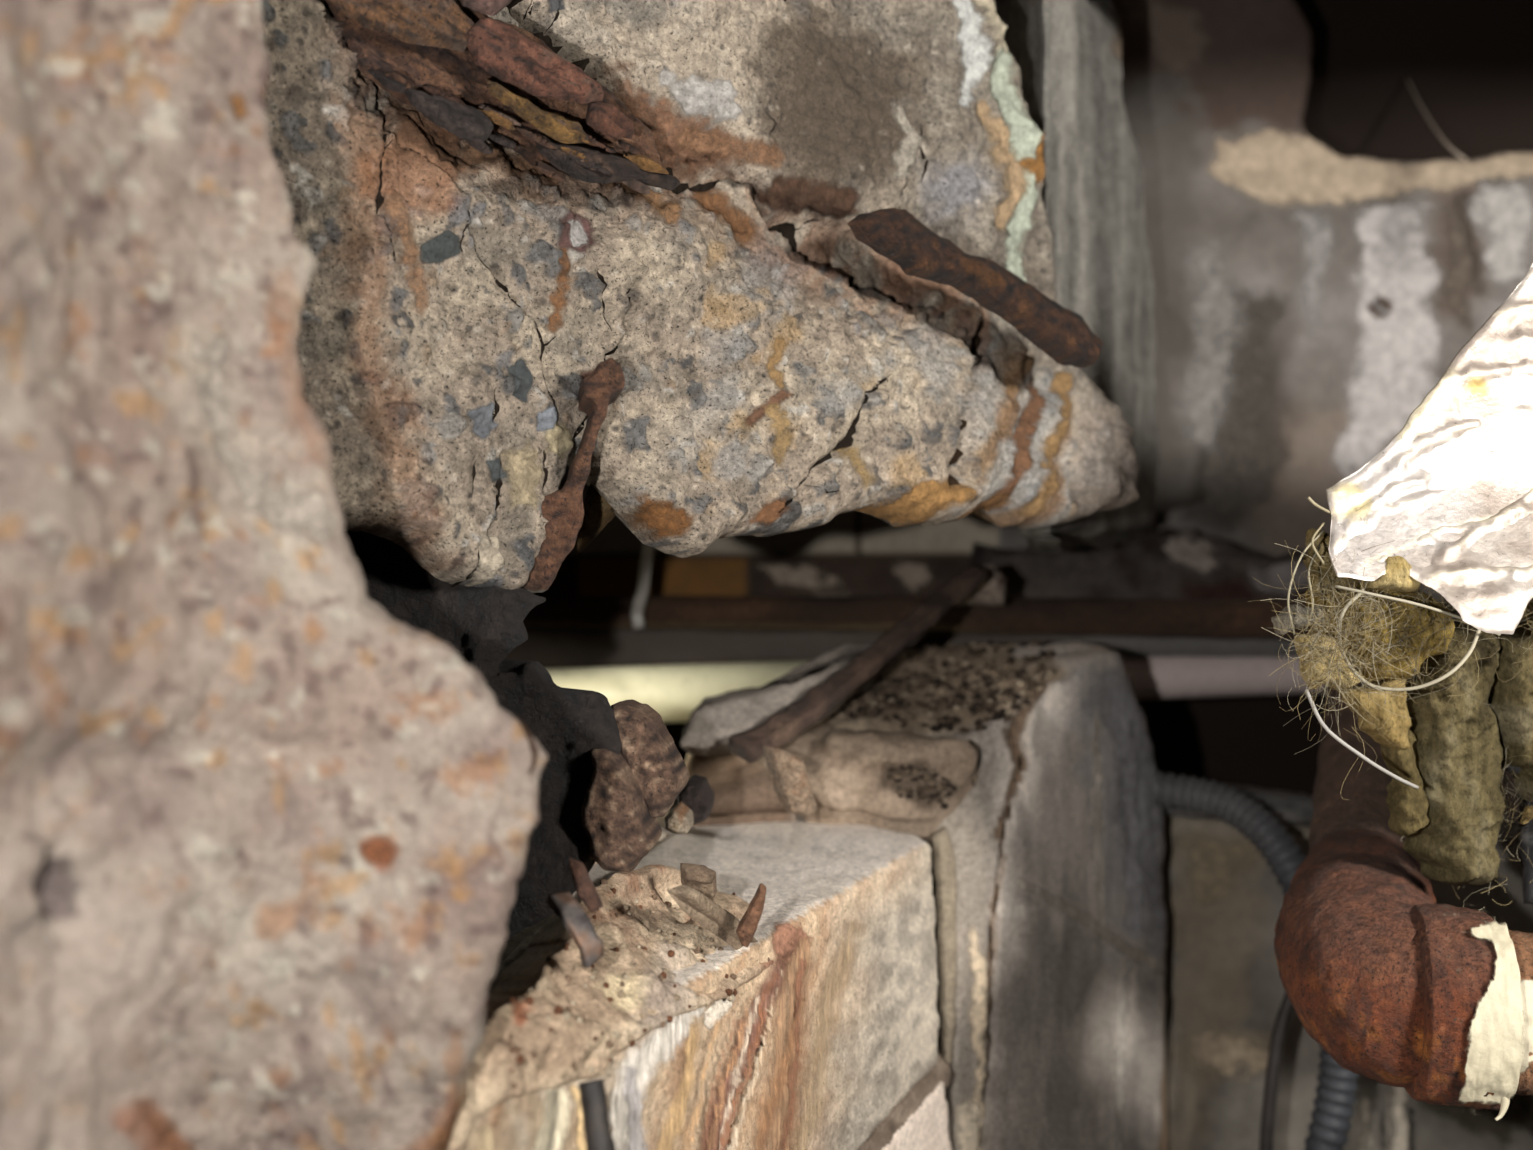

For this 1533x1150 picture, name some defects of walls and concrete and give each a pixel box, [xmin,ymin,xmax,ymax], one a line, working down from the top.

peeling [330,0,604,104]
corrosion [390,98,558,186]
flaking render [420,230,460,264]
crack [666,167,823,252]
corrosion [607,65,1103,527]
crack [970,319,984,355]
spalling [486,358,574,507]
crack [781,373,892,511]
crack [947,419,967,485]
corrosion [729,565,987,763]
peeling [680,863,717,901]
corrosion [658,923,855,1150]